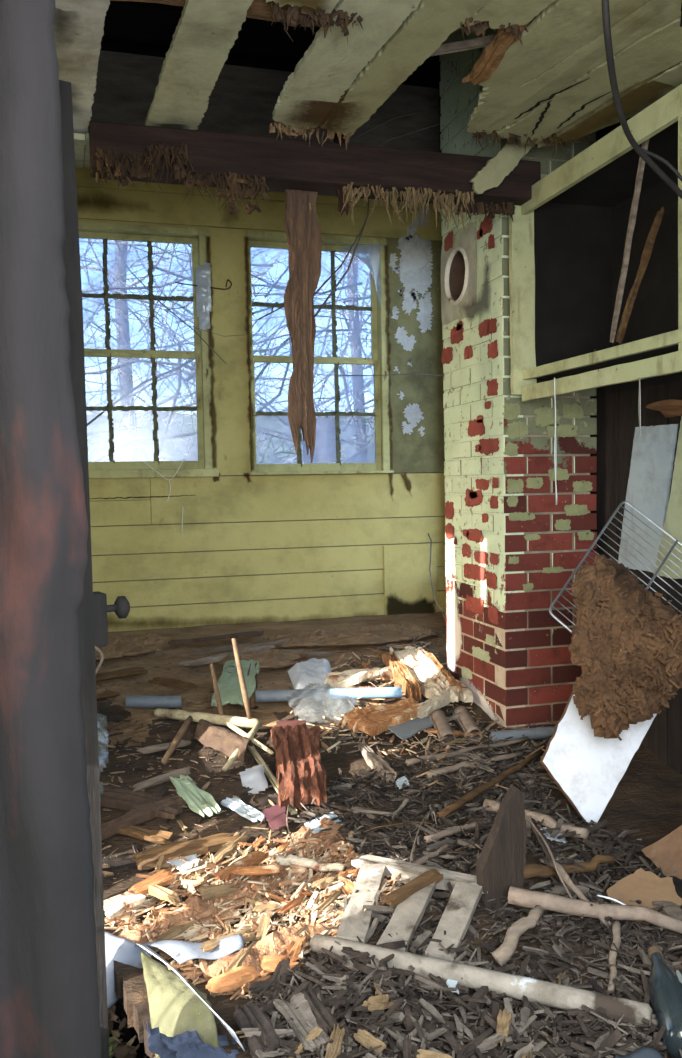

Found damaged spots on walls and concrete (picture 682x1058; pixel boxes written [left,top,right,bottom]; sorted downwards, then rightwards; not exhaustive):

leakage [293,93,355,130]
crack [515,78,612,135]
peeling [397,391,425,436]
peeling [468,378,584,456]
peeling [445,467,595,663]
peeling [461,667,472,680]